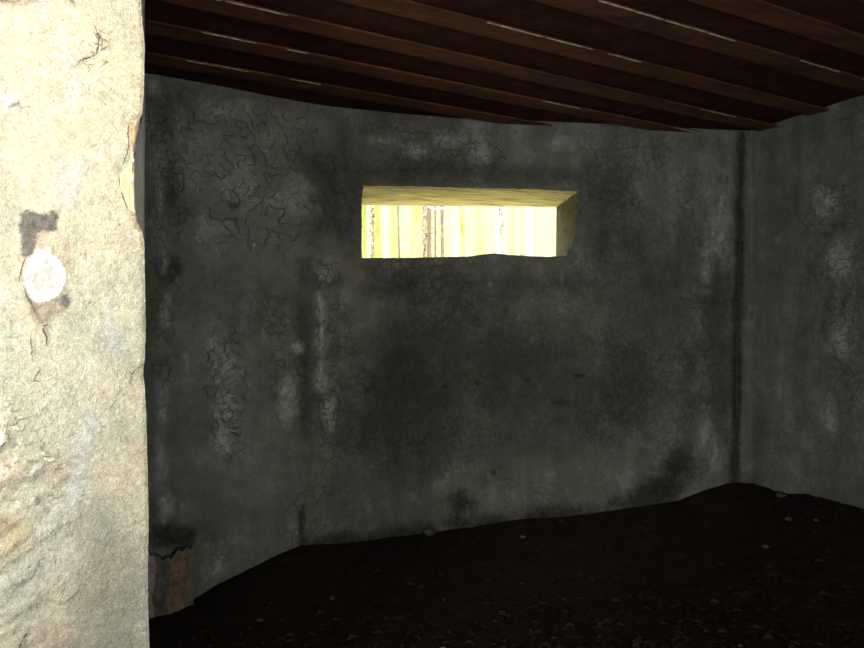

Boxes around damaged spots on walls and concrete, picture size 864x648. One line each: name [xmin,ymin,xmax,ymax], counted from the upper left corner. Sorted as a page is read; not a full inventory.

crack [76,22,112,66]
spalling [119,119,141,231]
crack [368,126,507,174]
water stain [23,231,68,323]
crack [108,91,342,459]